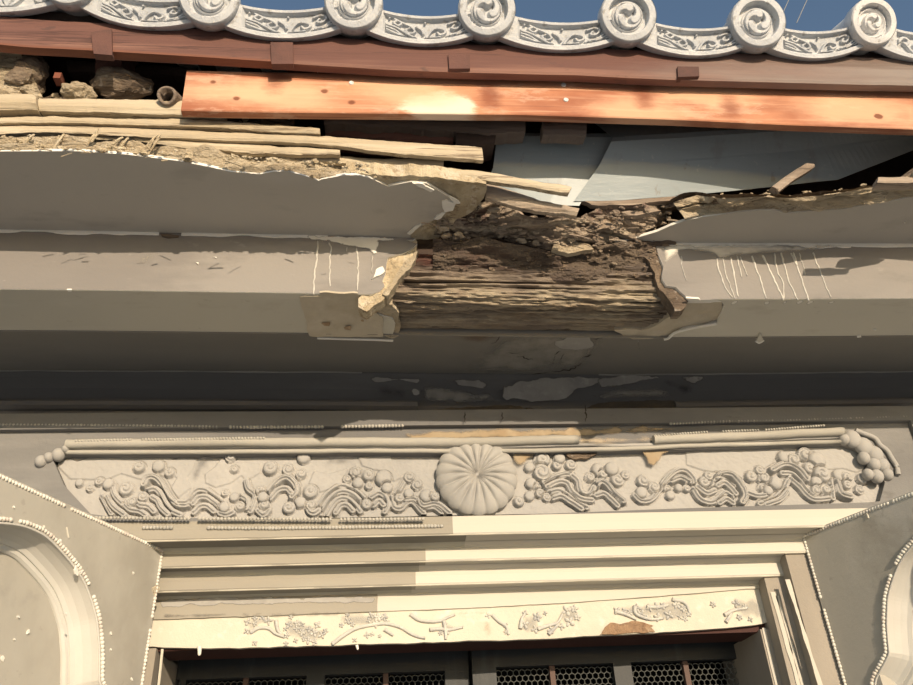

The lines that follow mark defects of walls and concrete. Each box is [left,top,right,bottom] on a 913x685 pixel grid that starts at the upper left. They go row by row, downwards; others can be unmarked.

flaking render [0,53,66,99]
flaking render [205,118,294,133]
flaking render [0,128,913,346]
peeling [371,375,675,410]
flaking render [600,621,655,635]